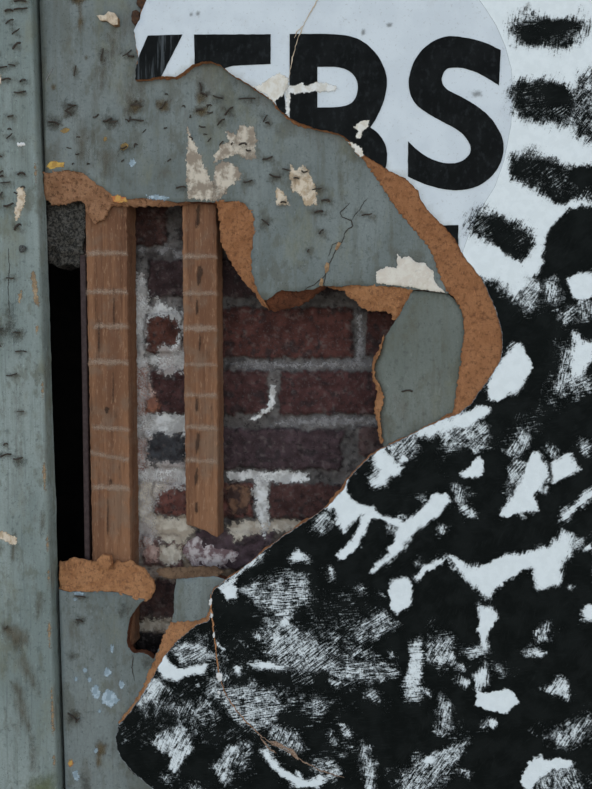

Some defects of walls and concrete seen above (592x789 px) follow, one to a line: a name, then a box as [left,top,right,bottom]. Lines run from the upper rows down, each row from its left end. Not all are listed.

peeling [97,11,120,27]
peeling [185,125,259,202]
peeling [14,186,26,221]
peeling [275,164,318,206]
crack [305,199,367,290]
peeling [376,254,445,293]
water stain [226,315,372,371]
water stain [91,272,215,567]
water stain [272,412,376,428]
spalling [224,481,254,515]
water stain [226,469,310,543]